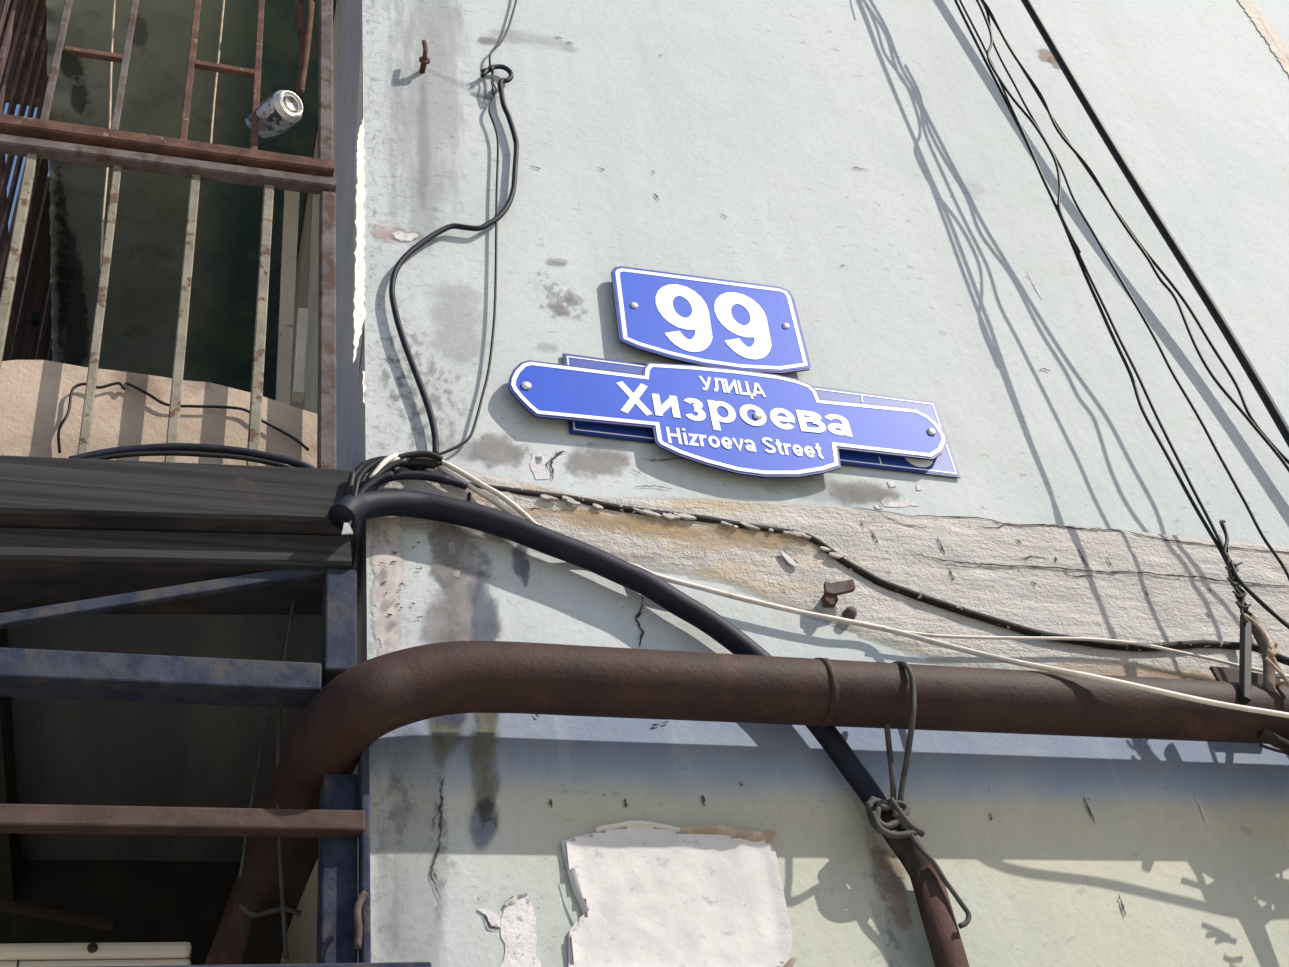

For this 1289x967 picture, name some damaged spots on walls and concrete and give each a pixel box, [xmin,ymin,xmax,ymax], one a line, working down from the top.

water stain [380,523,499,643]
crack [635,595,644,647]
crack [836,503,1289,587]
water stain [433,713,498,847]
peeling [477,892,541,967]